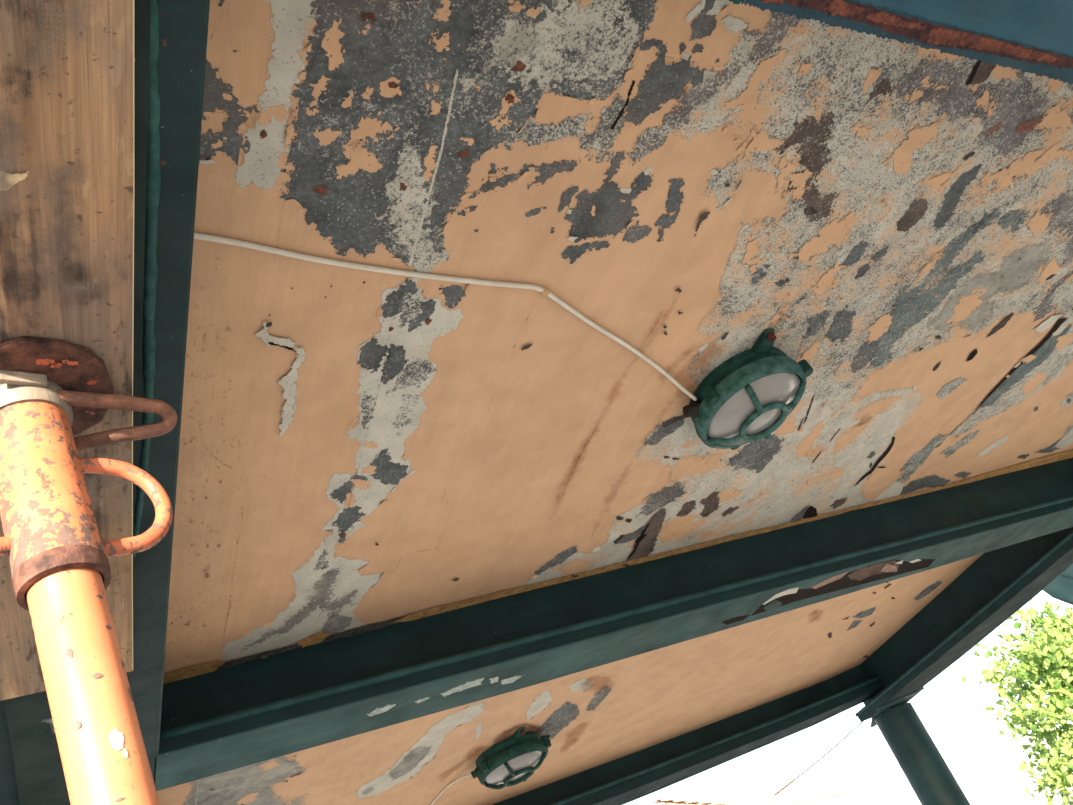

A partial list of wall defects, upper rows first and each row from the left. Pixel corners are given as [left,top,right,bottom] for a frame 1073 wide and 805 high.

rust [729,0,1073,85]
peeling [199,0,1073,661]
peeling [183,754,312,805]
peeling [356,702,486,799]
peeling [415,675,525,703]
peeling [526,679,613,739]